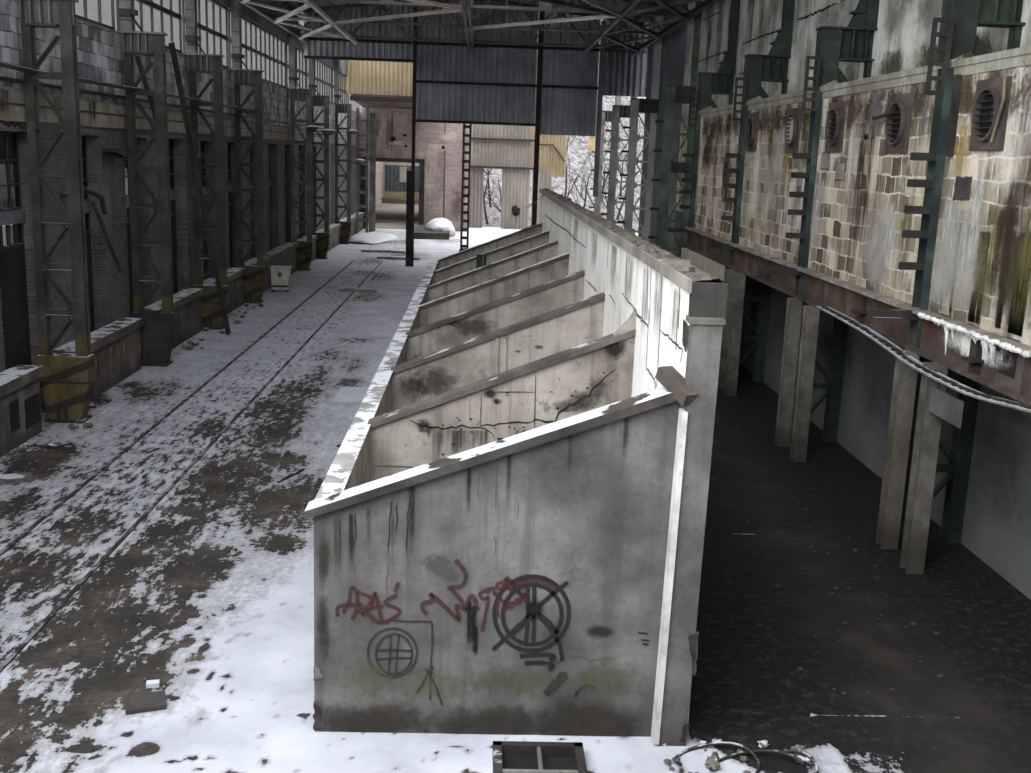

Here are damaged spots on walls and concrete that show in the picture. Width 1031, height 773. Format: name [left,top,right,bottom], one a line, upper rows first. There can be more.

damp [702,134,731,195]
damp [742,120,784,211]
crack [545,211,587,257]
damp [940,183,1031,293]
crack [586,258,683,389]
crack [410,370,614,439]
damp [339,515,353,555]